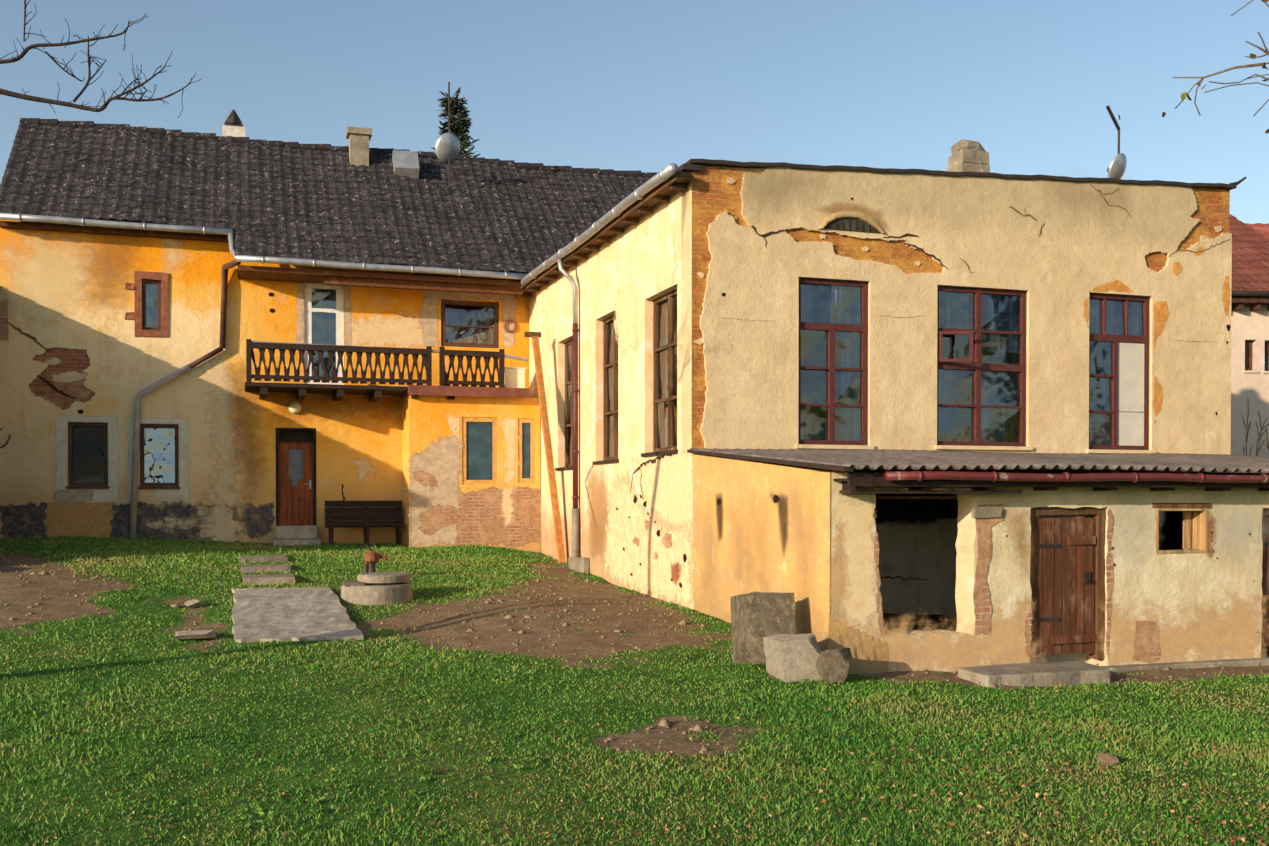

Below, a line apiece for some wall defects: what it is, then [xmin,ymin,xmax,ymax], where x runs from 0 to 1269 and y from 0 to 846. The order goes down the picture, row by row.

flaking render [784,228,944,274]
crack [1010,206,1045,236]
flaking render [1145,187,1230,276]
flaking render [28,348,95,414]
flaking render [614,166,763,537]
flaking render [1084,280,1132,326]
flaking render [1153,301,1169,348]
peeling [0,489,93,538]
peeling [110,359,275,542]
peeling [447,415,461,443]
flaking render [455,417,541,548]
flaking render [973,504,1008,634]